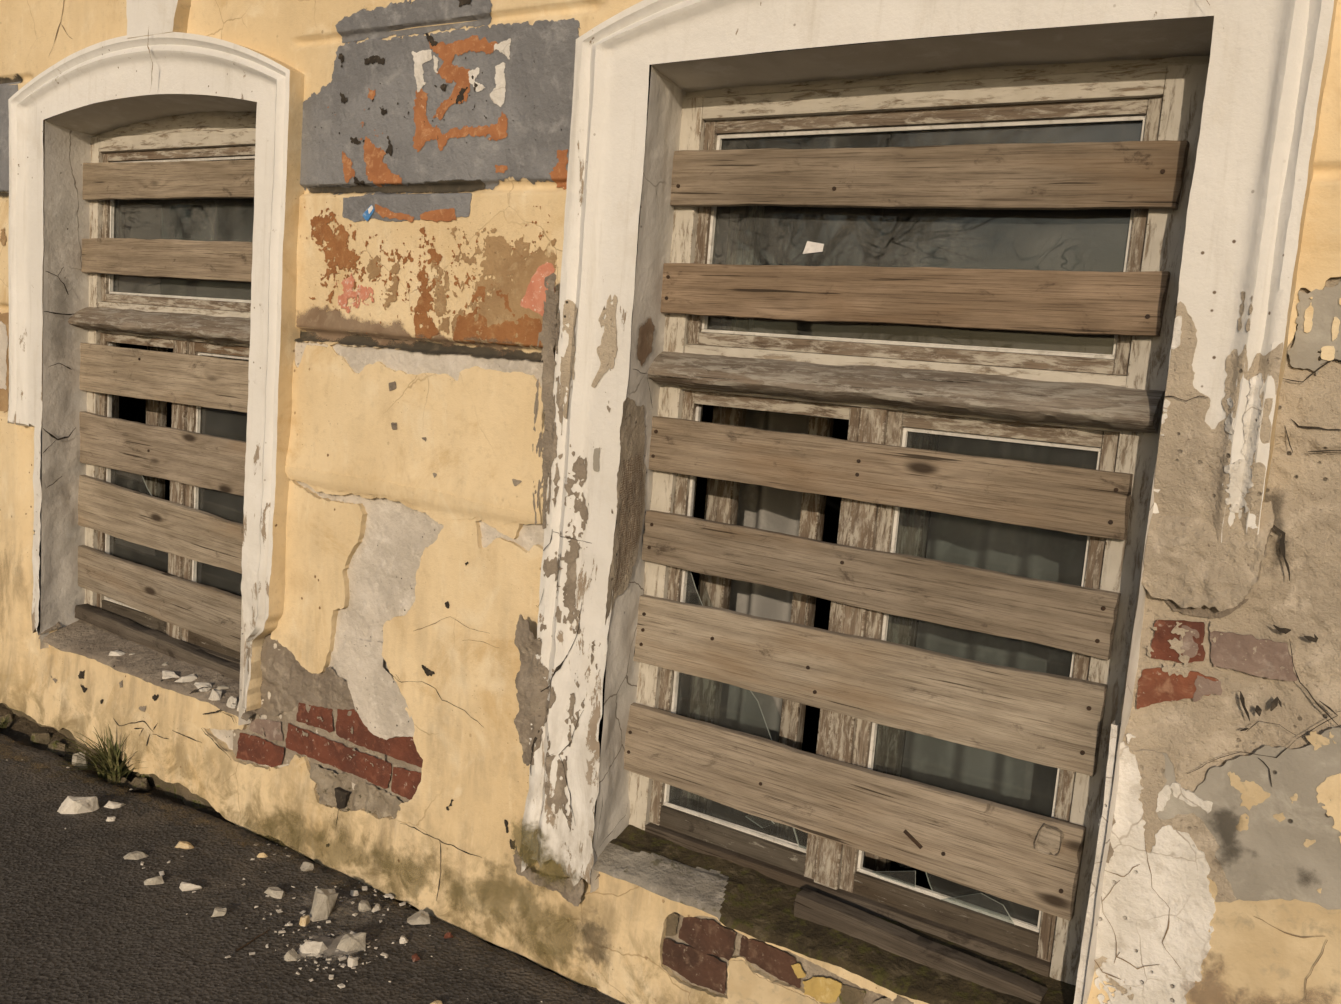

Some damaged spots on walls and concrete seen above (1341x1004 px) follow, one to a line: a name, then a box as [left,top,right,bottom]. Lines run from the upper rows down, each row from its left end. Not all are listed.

peeling [339,33,514,187]
peeling [549,149,568,190]
peeling [0,313,9,413]
spalling [295,202,602,831]
peeling [591,294,646,625]
crack [1285,418,1341,452]
spalling [162,481,444,819]
spalling [1094,277,1341,1004]
spalling [504,820,584,907]
spalling [662,912,914,1004]